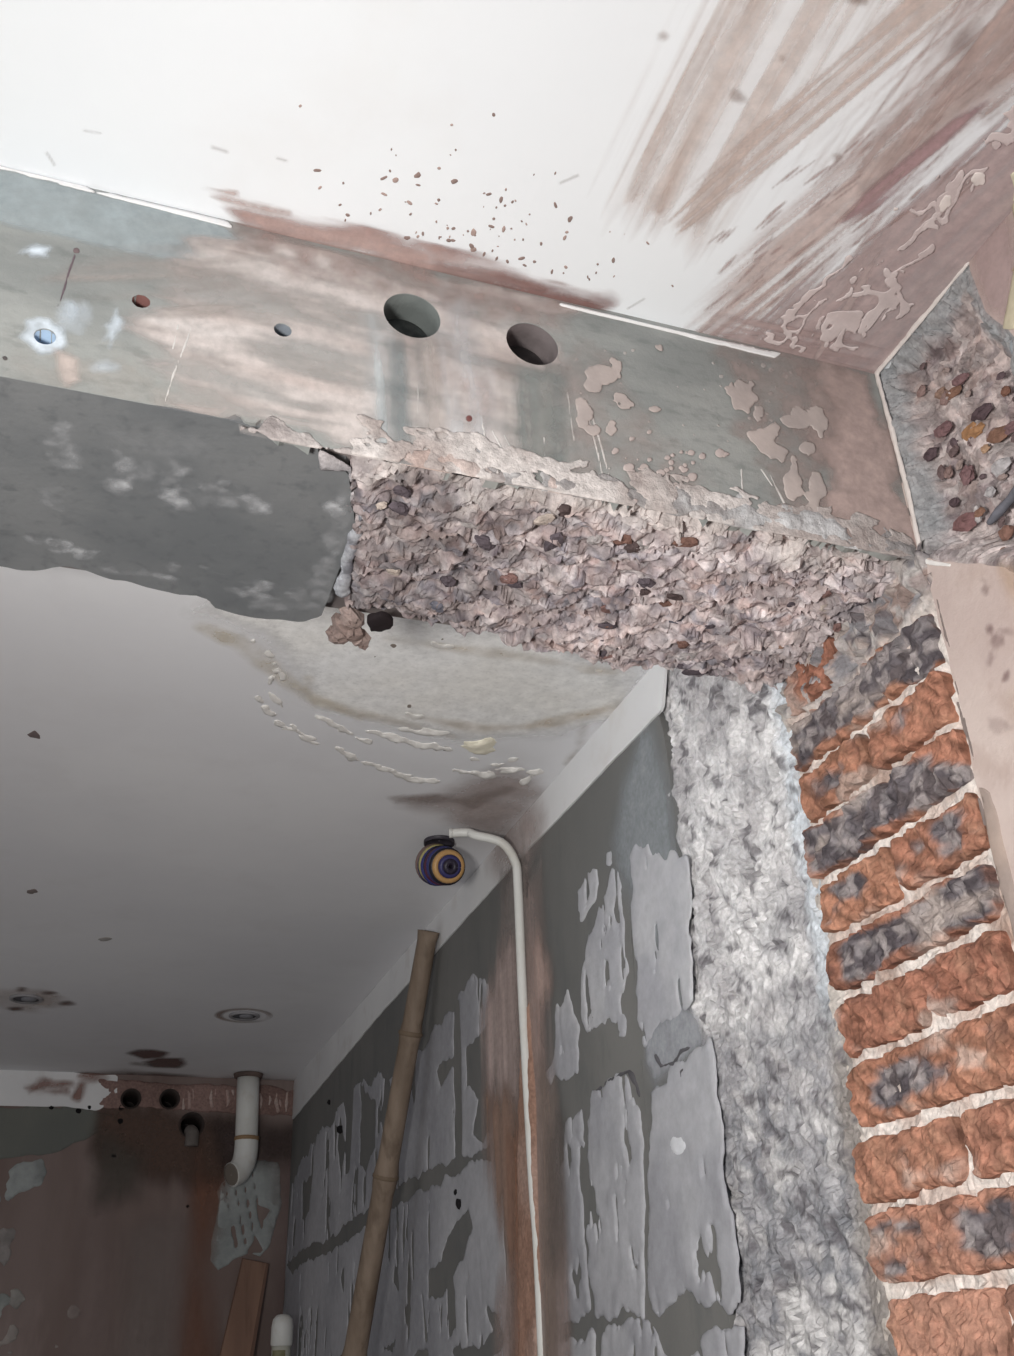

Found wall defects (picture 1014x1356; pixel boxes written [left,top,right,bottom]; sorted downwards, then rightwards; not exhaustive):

corrosion [221,192,606,310]
flaking render [207,167,1014,1356]
flaking render [0,1159,47,1201]
leakage [94,1107,236,1243]
leakage [257,1129,293,1160]